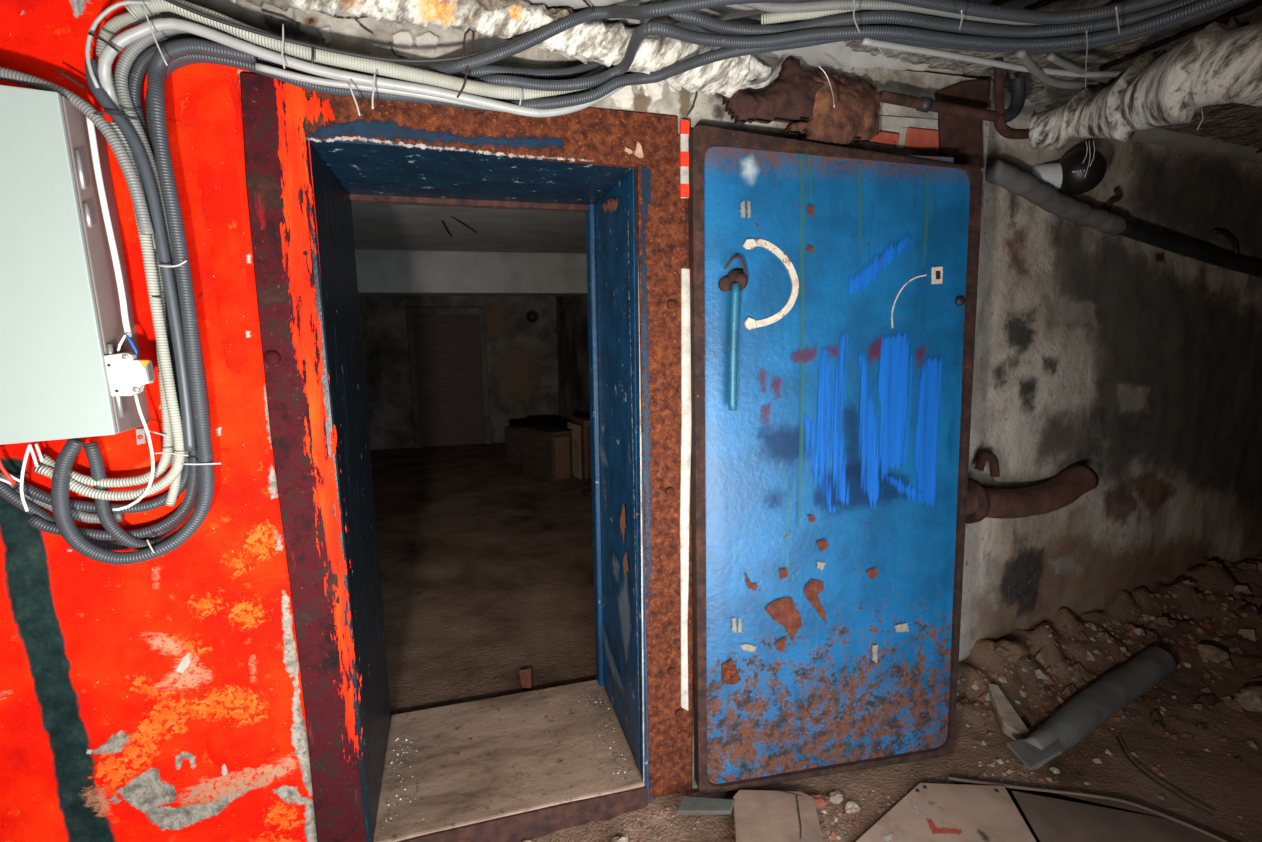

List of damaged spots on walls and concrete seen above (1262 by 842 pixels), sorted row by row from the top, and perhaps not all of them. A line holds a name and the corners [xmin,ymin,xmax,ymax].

spalling [843,0,1262,109]
spalling [1155,103,1262,153]
leakage [1131,147,1262,265]
leakage [996,314,1034,383]
peeling [264,386,272,449]
leakage [1020,378,1035,411]
leakage [1038,221,1262,555]
peeling [268,466,278,499]
peeling [221,519,283,578]
rust [765,580,826,652]
leakage [979,542,1205,642]
spalling [83,590,317,842]